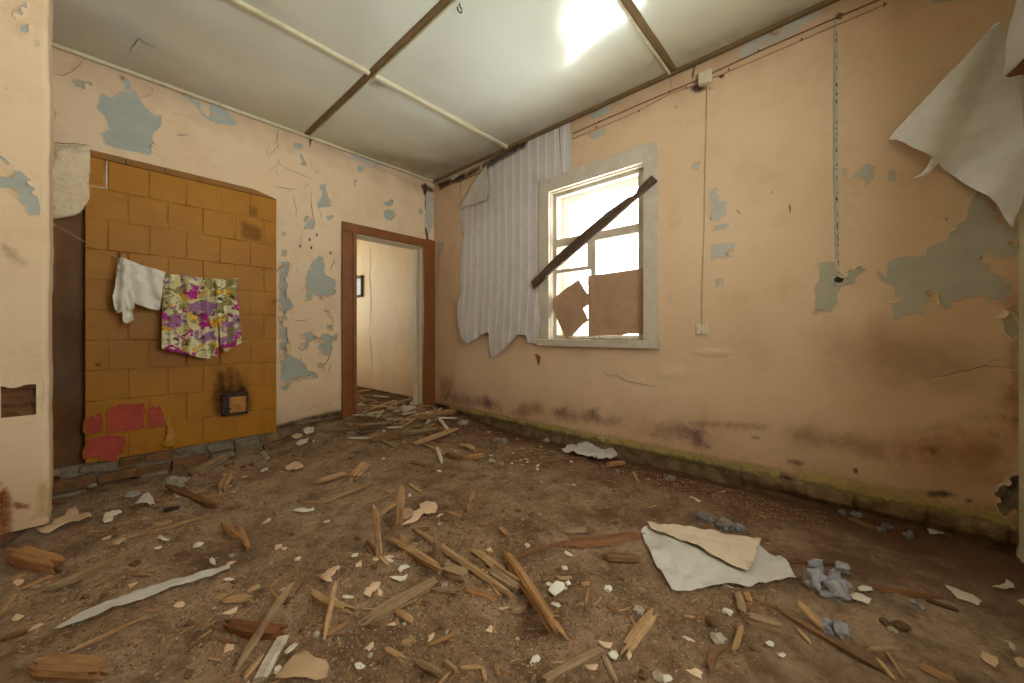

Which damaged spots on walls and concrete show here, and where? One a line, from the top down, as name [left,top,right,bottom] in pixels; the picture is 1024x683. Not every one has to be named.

peeling [71,75,191,157]
peeling [180,93,240,127]
peeling [0,154,44,217]
peeling [708,186,737,261]
peeling [277,183,338,391]
peeling [811,190,1019,342]
spalling [0,378,45,428]
peeling [82,402,175,463]
spalling [991,472,1019,519]